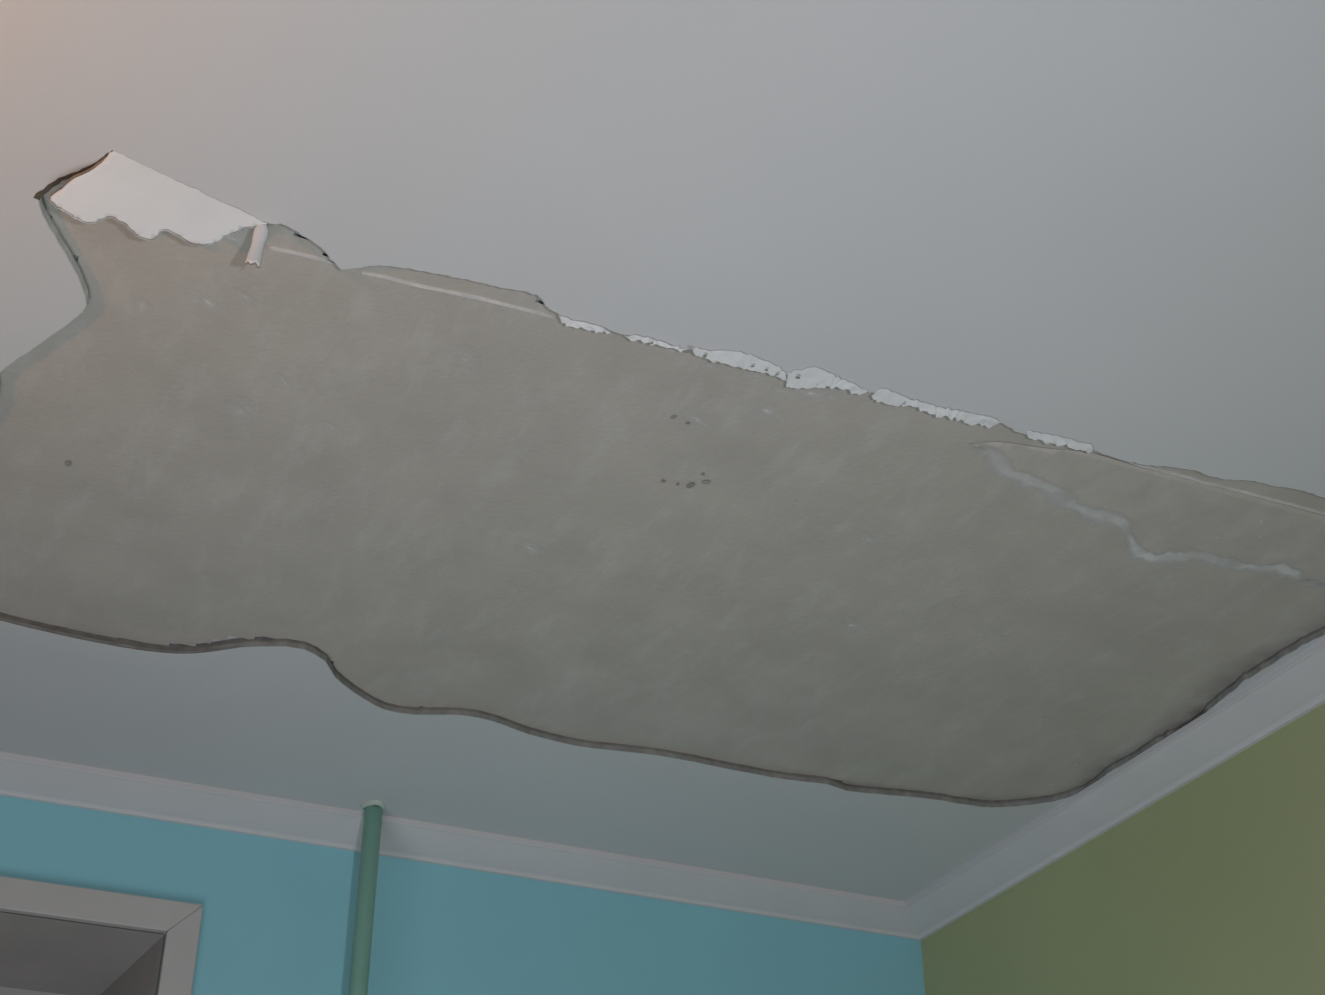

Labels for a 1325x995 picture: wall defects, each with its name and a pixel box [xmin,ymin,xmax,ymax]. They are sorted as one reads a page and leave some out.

crack [225,236,555,319]
flaking render [0,150,1325,807]
crack [1094,451,1325,515]